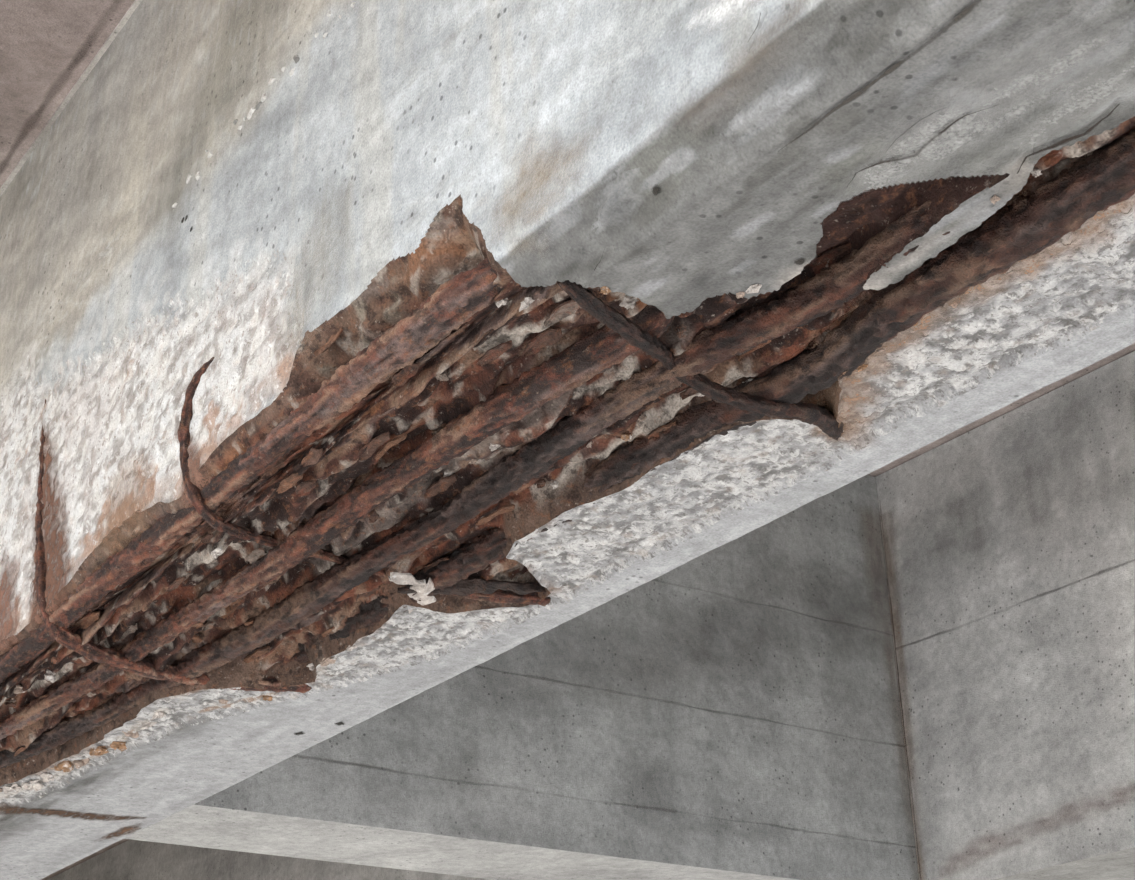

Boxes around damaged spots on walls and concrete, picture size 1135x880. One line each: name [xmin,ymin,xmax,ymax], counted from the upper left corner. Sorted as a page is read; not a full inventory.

peeling [233,55,300,130]
crack [846,105,996,189]
crack [1017,104,1119,174]
spalling [657,116,1135,388]
rust [0,129,1135,769]
spalling [0,193,1135,813]
rust [0,804,145,840]